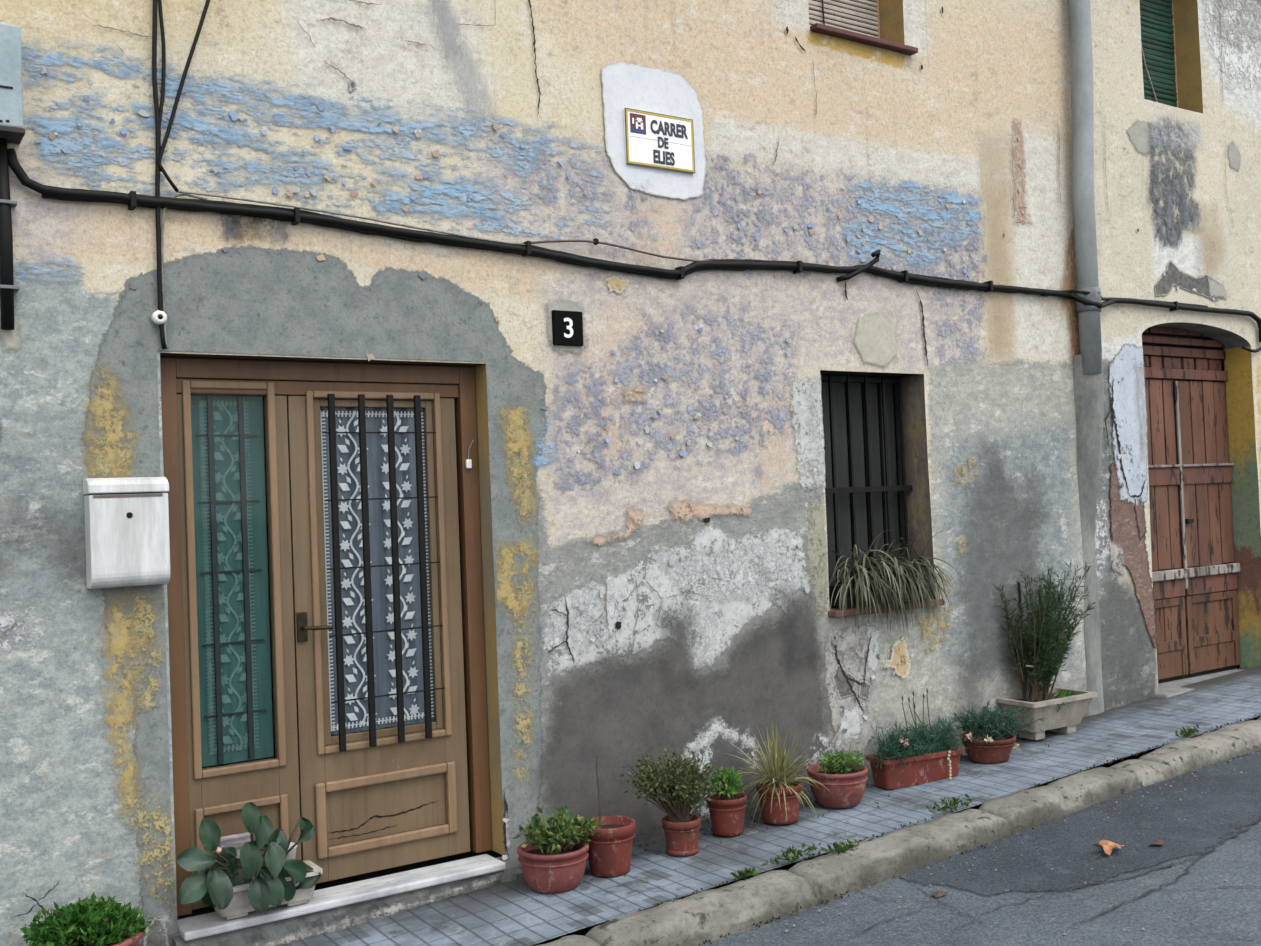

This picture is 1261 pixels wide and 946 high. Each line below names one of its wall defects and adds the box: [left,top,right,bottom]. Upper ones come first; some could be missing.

peeling [21,40,656,252]
crack [528,0,541,115]
peeling [685,156,987,362]
spalling [1155,260,1228,301]
peeling [500,298,828,619]
peeling [1094,343,1157,648]
peeling [104,590,175,946]
crack [549,555,713,662]
water stain [541,524,829,843]
crack [834,634,872,712]
spalling [806,624,914,776]
spalling [256,814,512,946]